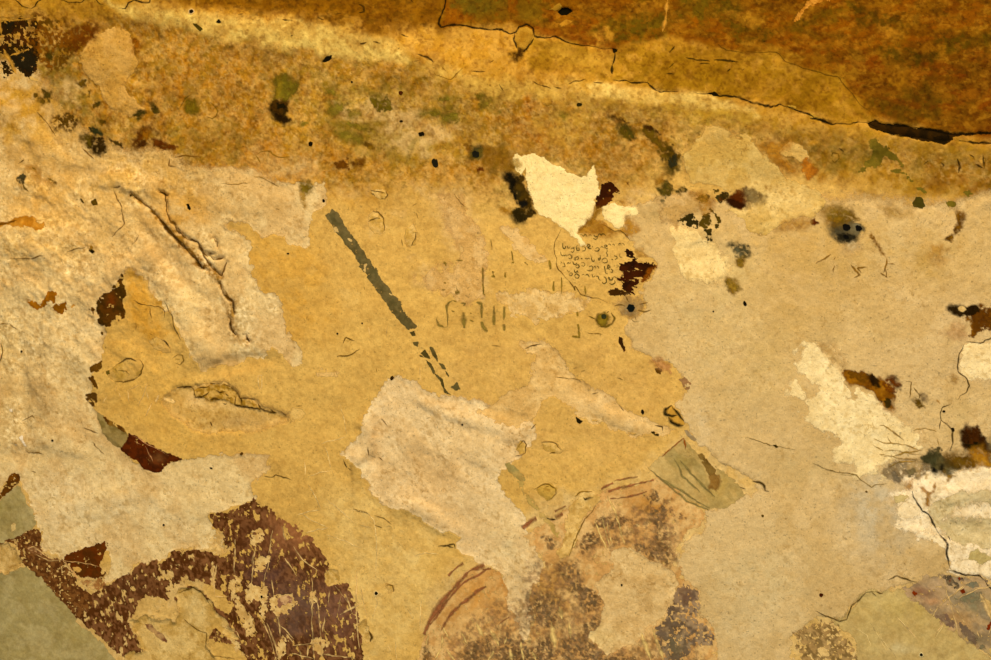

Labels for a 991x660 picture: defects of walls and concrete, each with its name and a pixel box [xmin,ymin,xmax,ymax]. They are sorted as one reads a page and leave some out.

water stain [325,89,363,141]
water stain [370,97,392,112]
water stain [420,97,458,123]
crack [438,0,991,173]
mould [469,146,536,224]
crack [113,186,249,341]
crack [134,300,184,365]
flaking render [0,15,373,660]
rust [947,304,991,338]
flaking render [340,138,991,660]
rust [819,346,901,410]
crack [939,338,991,450]